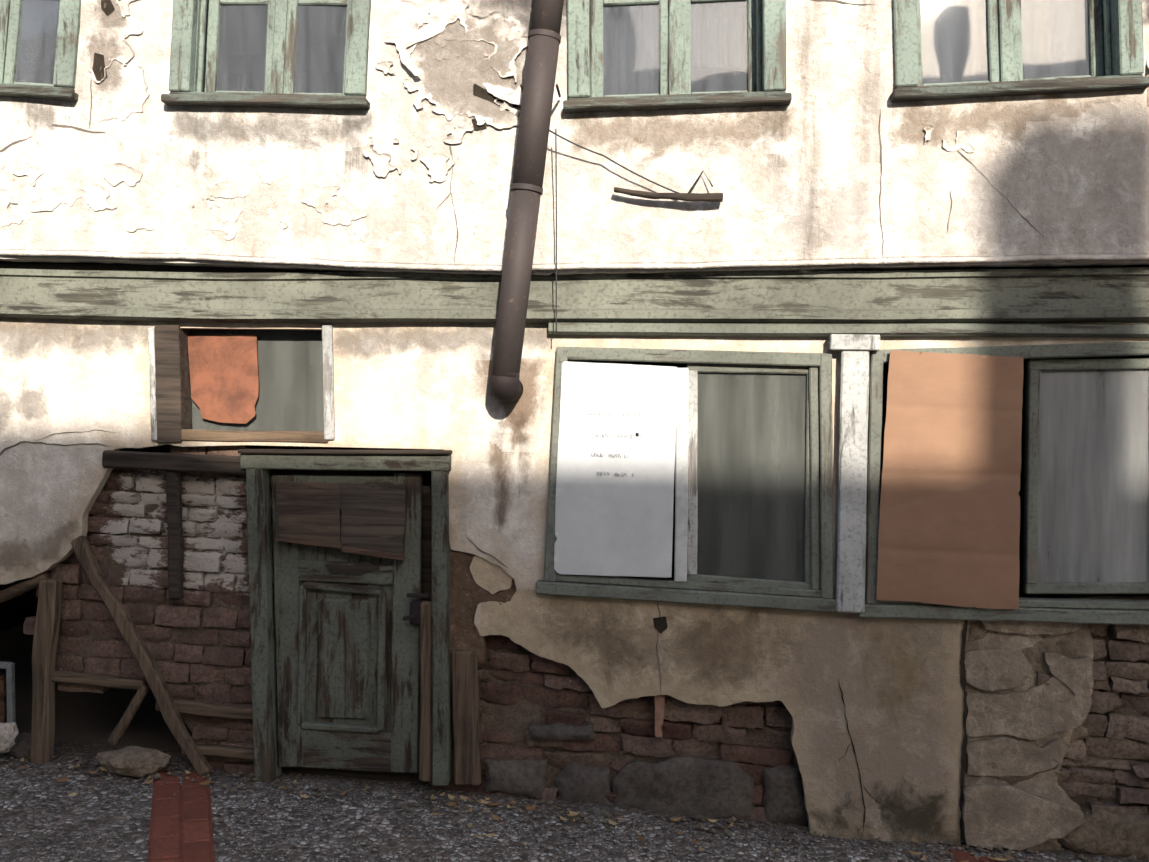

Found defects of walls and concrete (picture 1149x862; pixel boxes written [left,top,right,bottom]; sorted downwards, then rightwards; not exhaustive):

crack [0,78,105,152]
peeling [88,0,150,121]
peeling [363,0,529,182]
peeling [0,163,143,228]
peeling [302,184,368,226]
crack [0,430,118,456]
flaking render [160,445,250,456]
flaking render [0,468,254,774]
flaking render [428,547,809,827]
crack [838,678,880,836]
flaking render [961,620,1149,860]